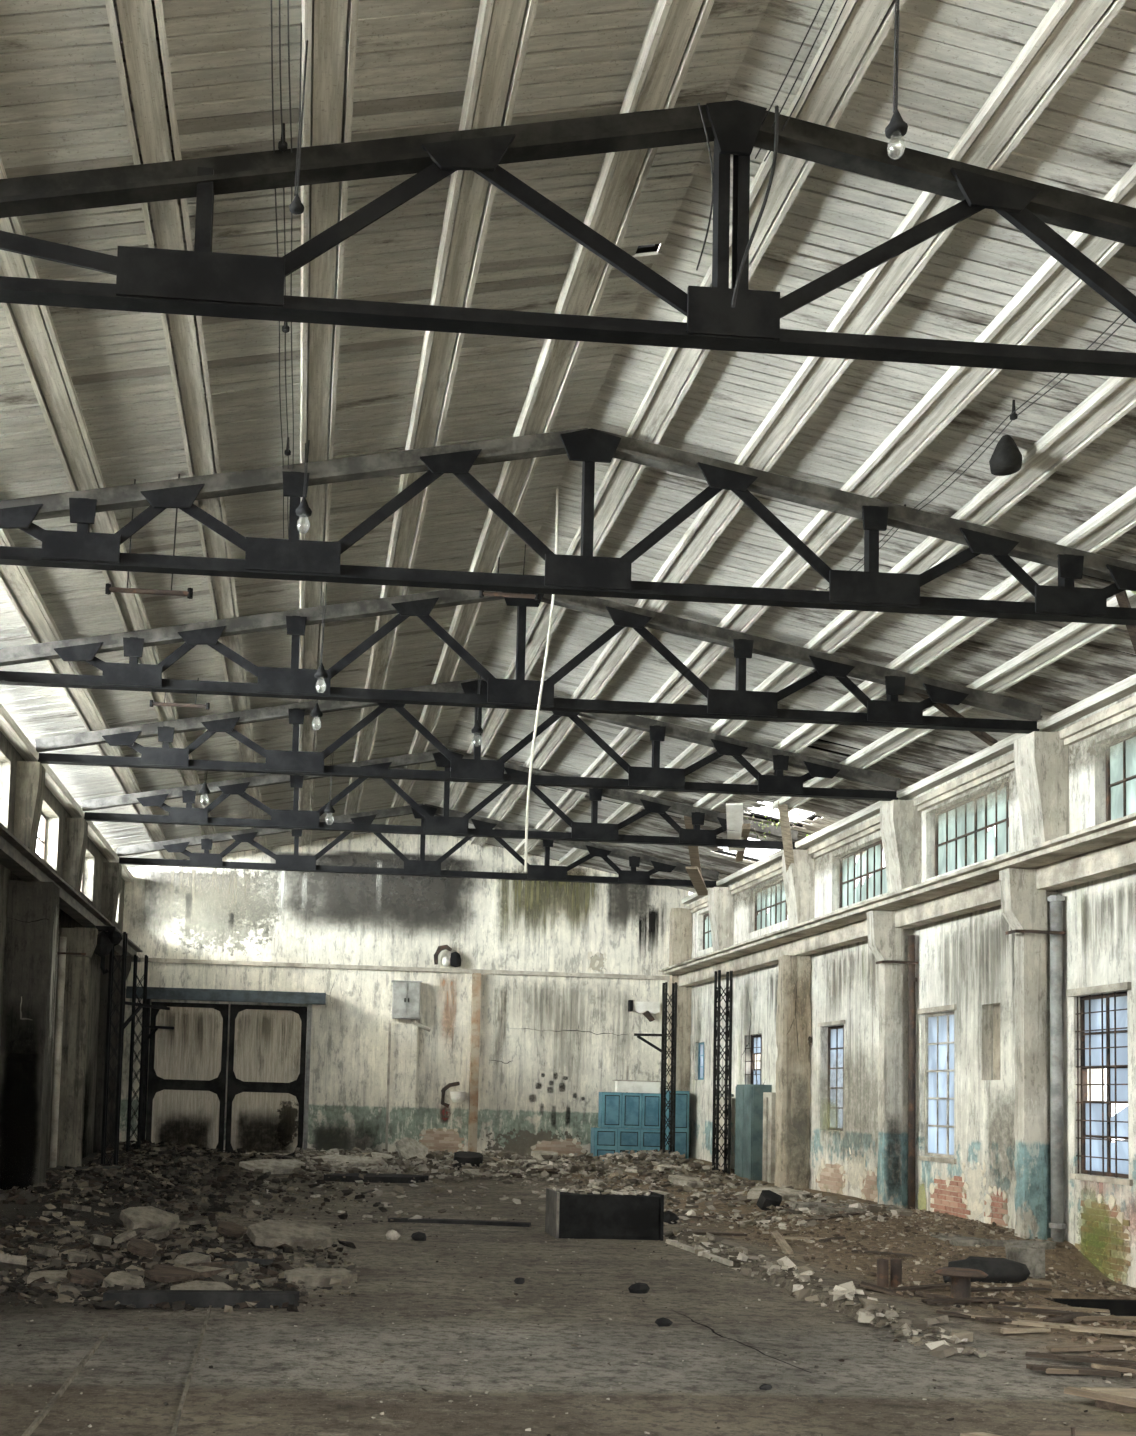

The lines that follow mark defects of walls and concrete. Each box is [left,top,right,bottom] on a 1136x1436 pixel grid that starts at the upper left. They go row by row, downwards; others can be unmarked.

water stain [168,867,284,955]
water stain [833,954,875,998]
spalling [816,1147,878,1202]
spalling [929,1161,1010,1227]
crack [673,1310,811,1373]